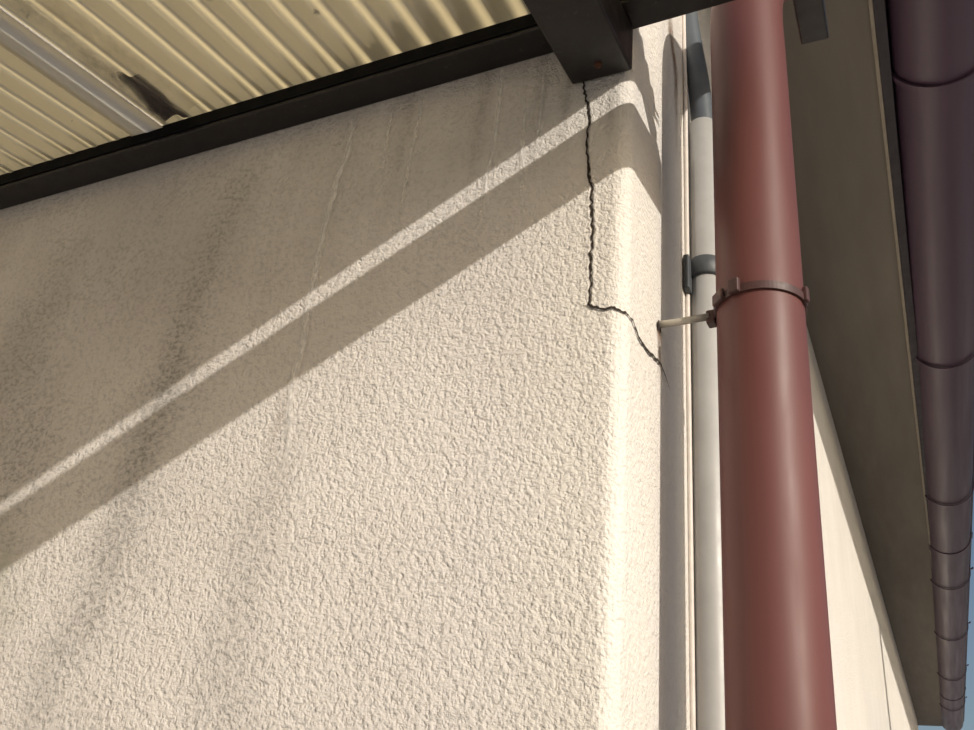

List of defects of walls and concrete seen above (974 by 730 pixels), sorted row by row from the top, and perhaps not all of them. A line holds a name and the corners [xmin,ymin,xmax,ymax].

crack [582,82,669,386]